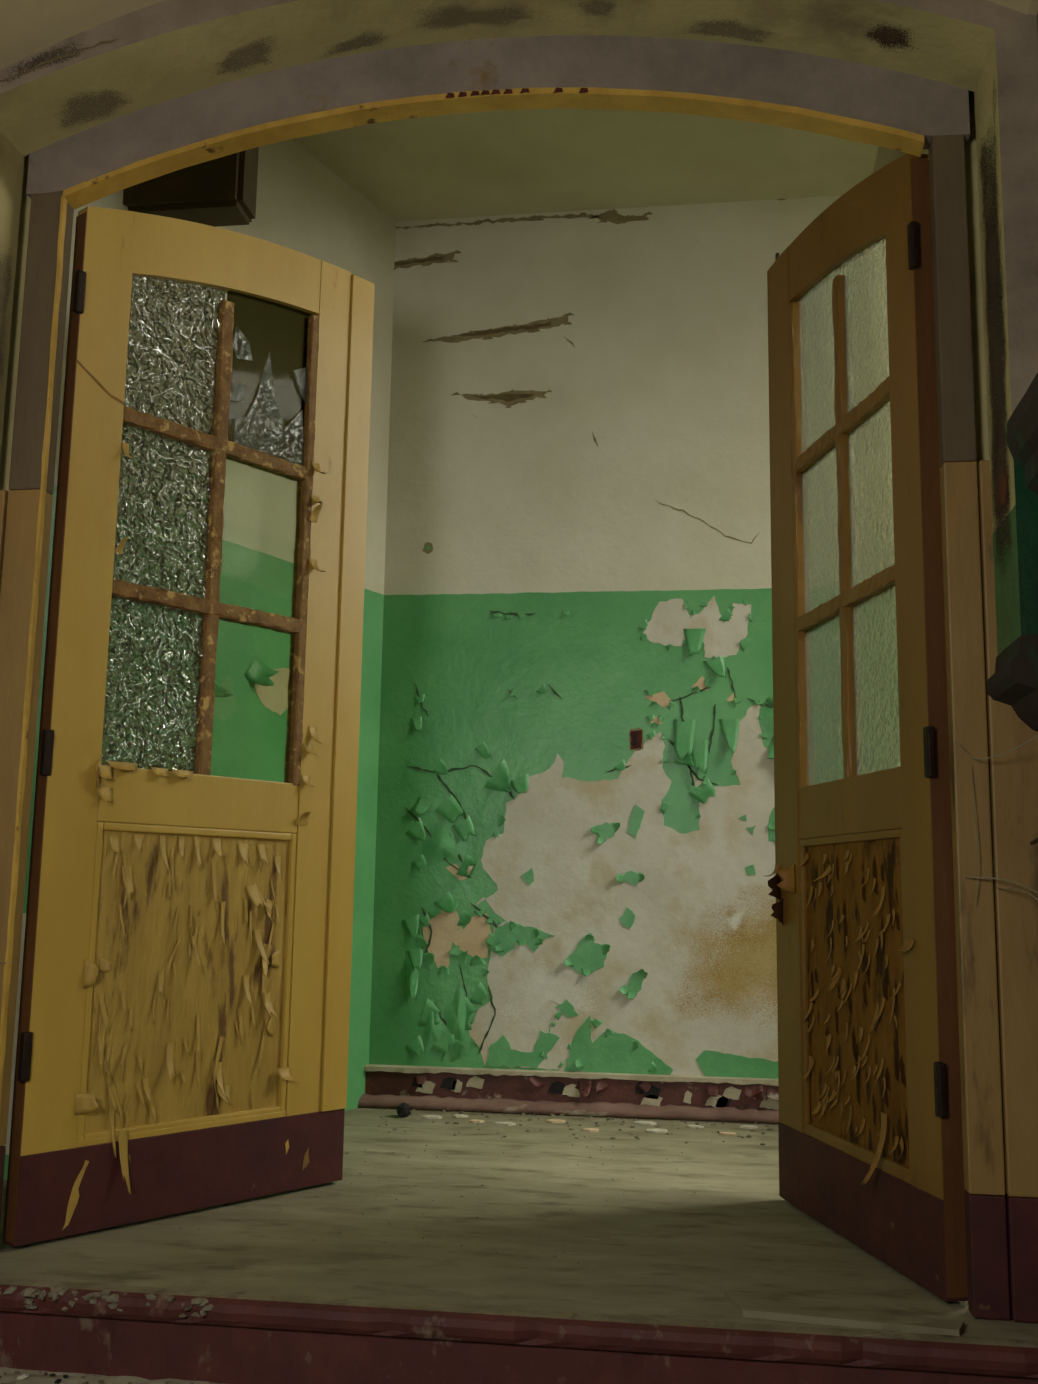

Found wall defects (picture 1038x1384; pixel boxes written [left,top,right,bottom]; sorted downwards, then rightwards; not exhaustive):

damp [316,1,553,59]
damp [671,16,779,45]
damp [858,22,919,54]
flaking render [423,313,574,343]
flaking render [451,389,552,408]
crack [657,501,759,544]
peeling [639,596,755,694]
peeling [402,688,914,1186]
damp [653,874,778,1053]